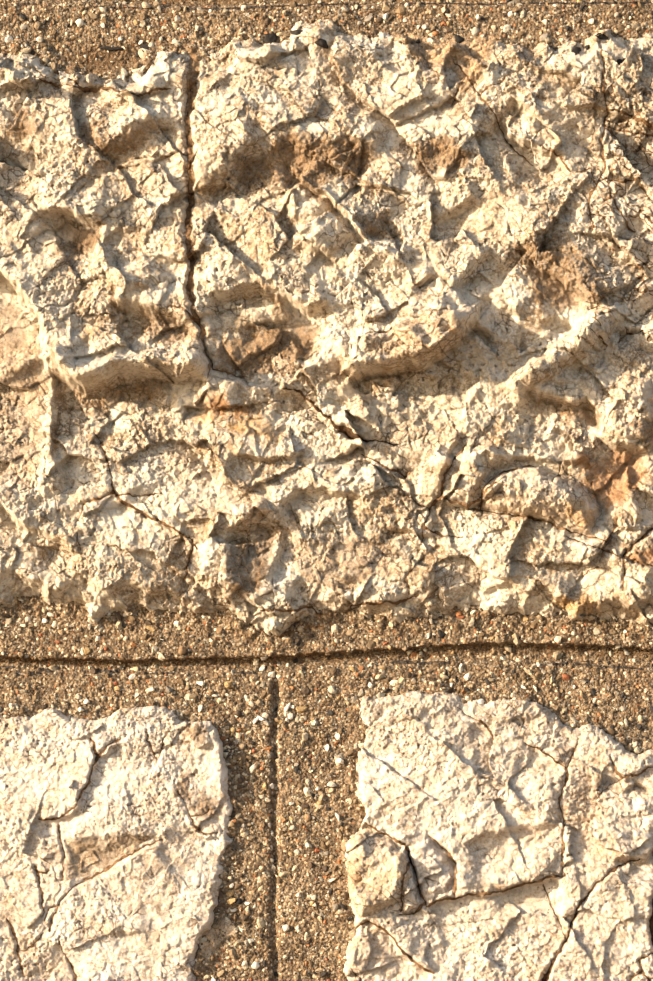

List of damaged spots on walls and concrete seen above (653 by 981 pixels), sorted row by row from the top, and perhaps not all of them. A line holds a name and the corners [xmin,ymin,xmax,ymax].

crack [32,47,247,378]
crack [452,49,653,355]
crack [260,387,653,694]
crack [6,738,162,981]
crack [146,726,171,780]
crack [176,788,218,835]
crack [355,743,640,981]
crack [595,754,652,800]
crack [629,900,653,981]